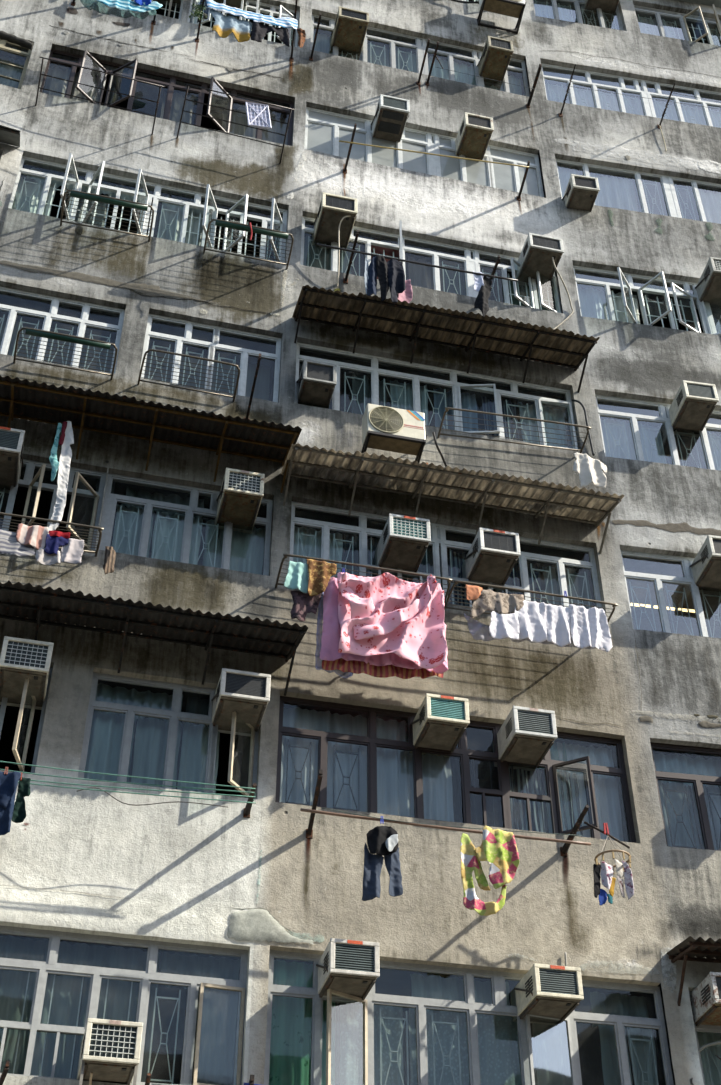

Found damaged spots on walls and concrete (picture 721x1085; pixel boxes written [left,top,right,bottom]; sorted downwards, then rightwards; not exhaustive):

peeling [0,260,220,314]
peeling [612,519,721,536]